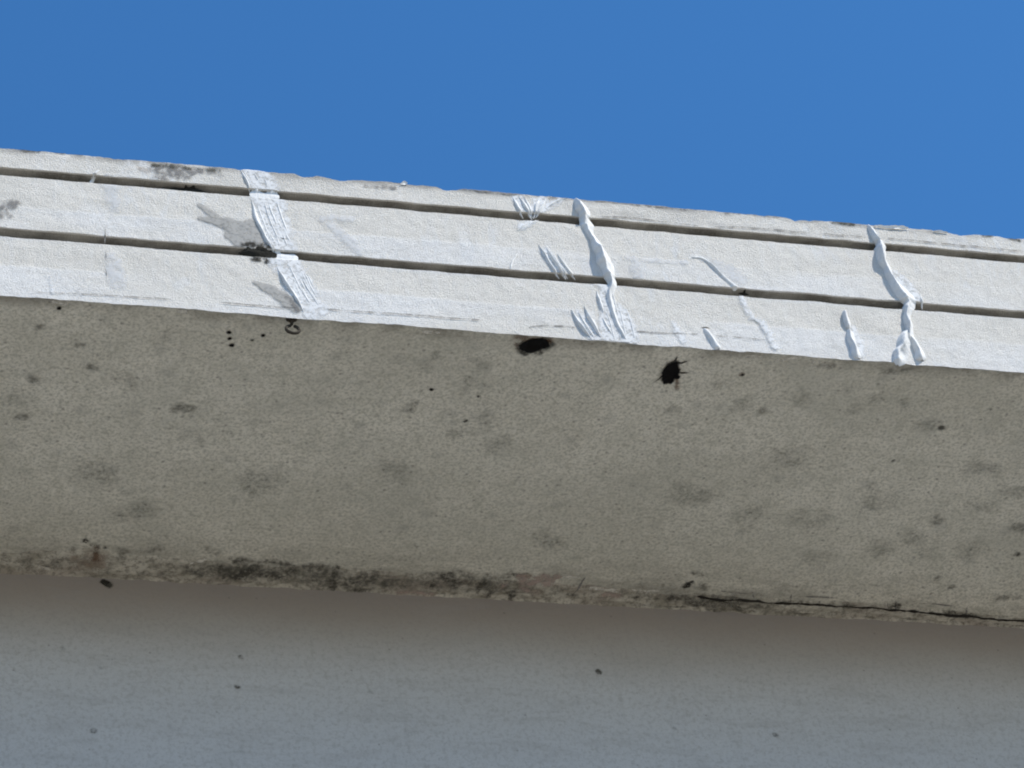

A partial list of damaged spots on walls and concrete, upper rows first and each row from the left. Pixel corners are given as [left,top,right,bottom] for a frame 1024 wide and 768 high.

crack [47,232,166,299]
crack [329,309,480,320]
crack [637,327,765,382]
water stain [186,558,515,600]
crack [697,591,1024,622]